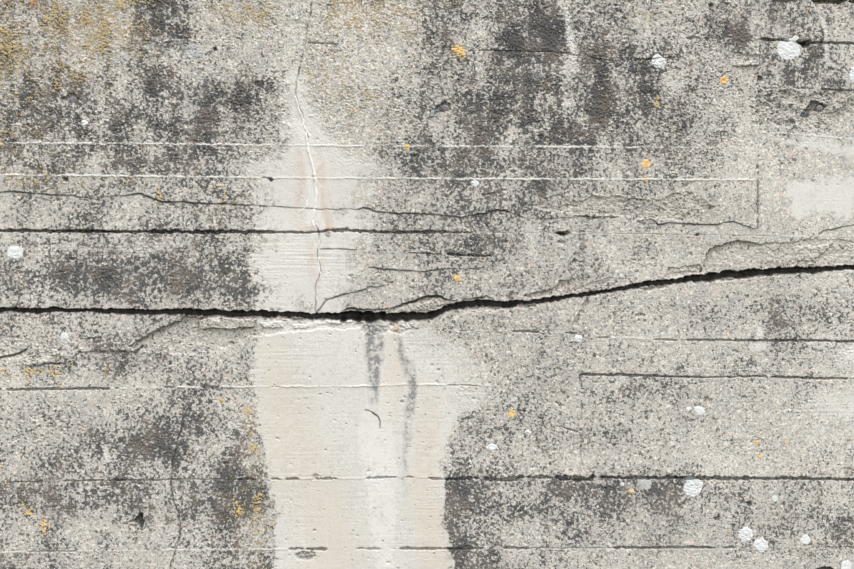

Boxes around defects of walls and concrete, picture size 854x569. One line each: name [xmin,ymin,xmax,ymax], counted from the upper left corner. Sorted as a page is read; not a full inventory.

crack [295,0,313,138]
water stain [562,2,579,86]
crack [654,31,672,133]
water stain [228,62,499,569]
crack [0,190,854,324]
crack [169,389,193,569]